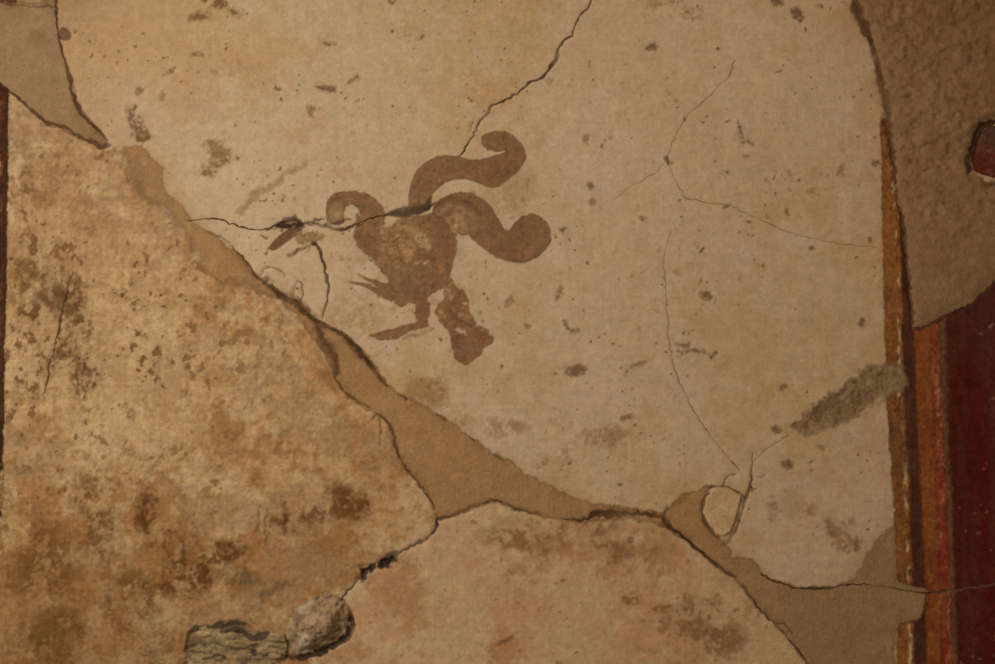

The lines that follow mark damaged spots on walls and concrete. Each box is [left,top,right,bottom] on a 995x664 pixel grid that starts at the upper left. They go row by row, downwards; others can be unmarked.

spalling [58,28,71,40]
crack [460,0,592,155]
spalling [384,197,431,217]
crack [199,215,387,363]
spalling [791,364,908,436]
peeling [702,486,753,537]
spalling [360,556,397,580]
crack [762,575,867,590]
spalling [183,619,287,664]